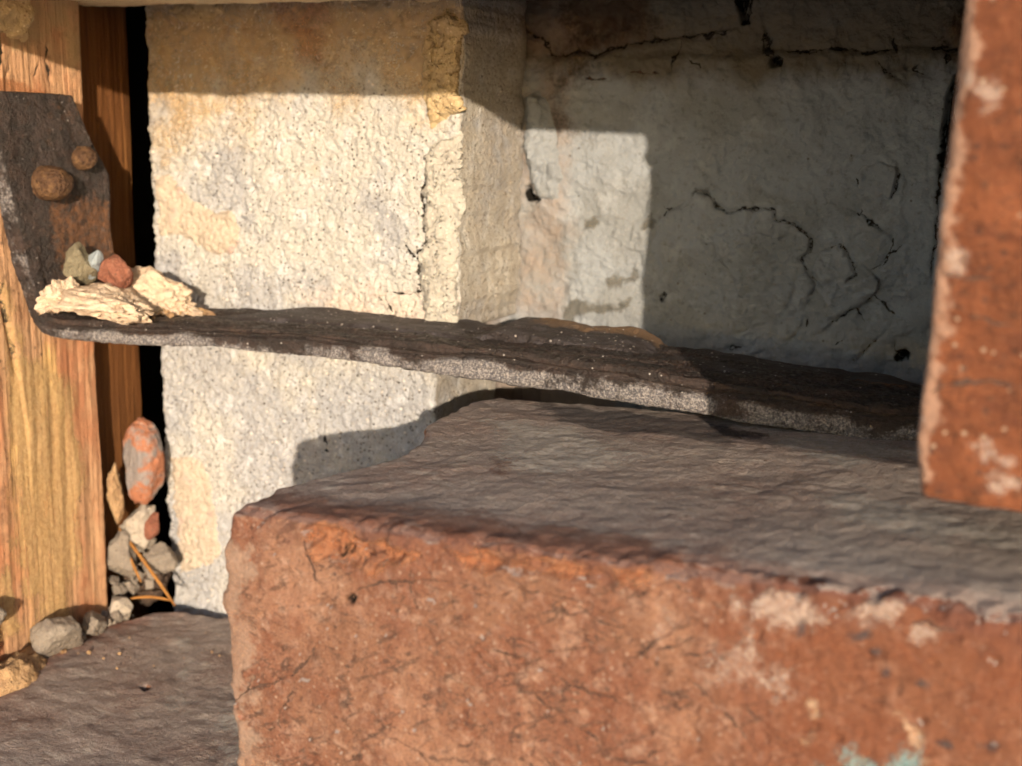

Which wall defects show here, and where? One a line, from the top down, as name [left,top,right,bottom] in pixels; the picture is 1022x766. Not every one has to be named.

crack [526,29,727,81]
crack [747,0,962,77]
crack [385,177,427,312]
crack [702,193,902,354]
crack [930,164,993,281]
rust [223,307,923,388]